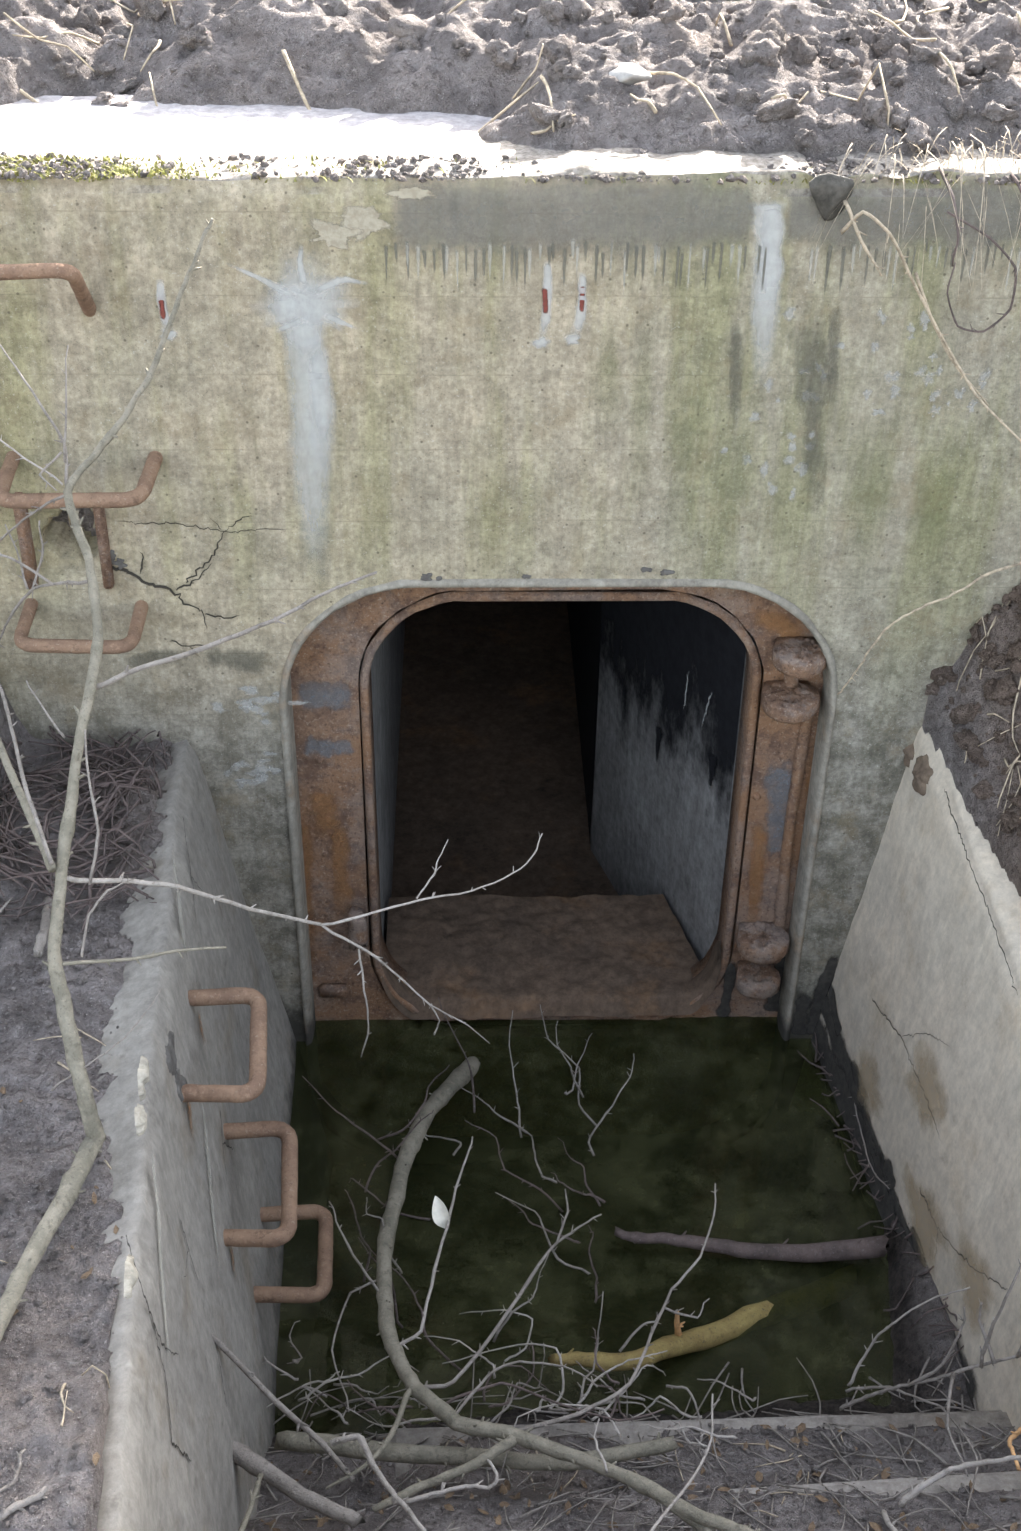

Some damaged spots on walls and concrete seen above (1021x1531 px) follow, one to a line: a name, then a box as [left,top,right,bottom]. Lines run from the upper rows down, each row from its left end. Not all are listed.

leakage [384,185,1021,331]
crack [112,516,281,656]